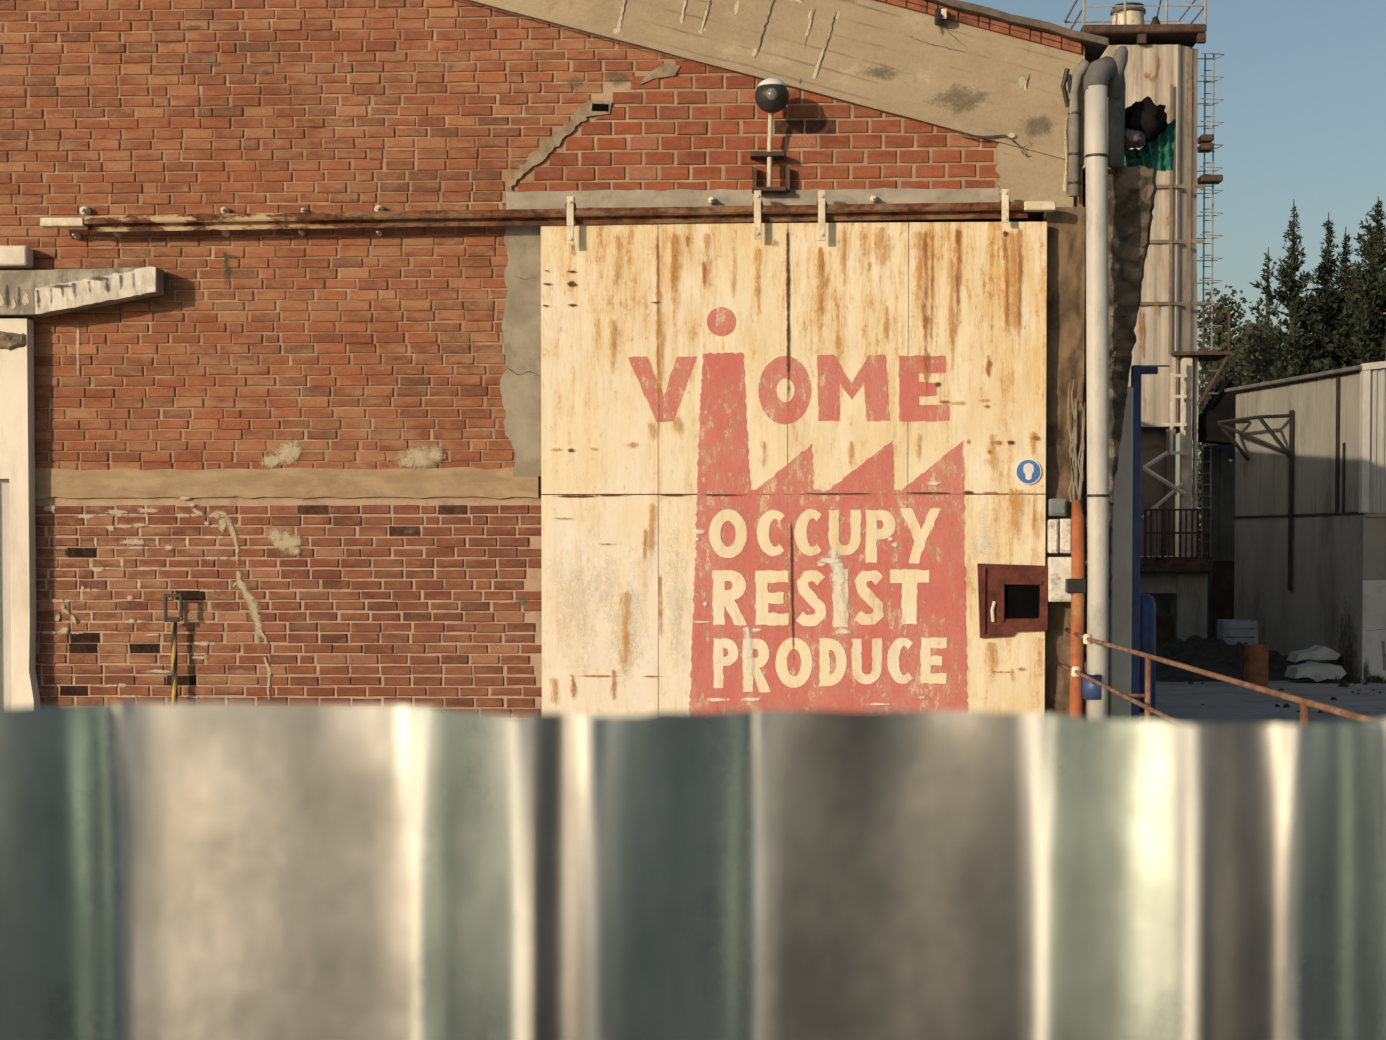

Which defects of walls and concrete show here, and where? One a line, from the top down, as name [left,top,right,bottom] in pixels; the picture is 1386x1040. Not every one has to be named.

crack [462,0,840,84]
hole [590,100,612,116]
corrosion [627,234,711,447]
corrosion [754,230,790,394]
corrosion [914,228,989,408]
corrosion [1003,229,1022,337]
corrosion [988,432,1039,464]
corrosion [643,494,688,559]
corrosion [907,489,1035,531]